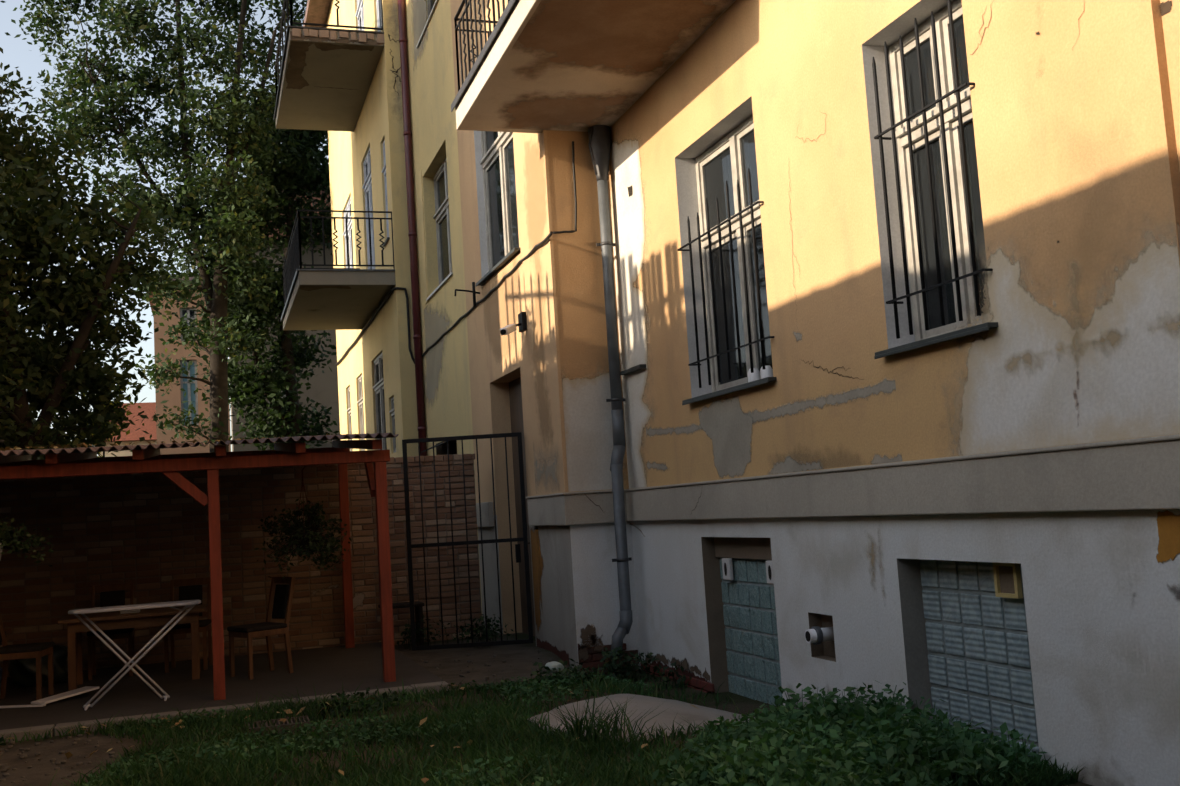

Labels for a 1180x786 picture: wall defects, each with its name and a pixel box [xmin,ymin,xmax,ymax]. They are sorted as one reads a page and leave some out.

crack [970,2,993,55]
peeling [562,139,653,492]
peeling [951,224,1180,456]
peeling [1156,510,1180,563]
flaking render [536,625,715,694]